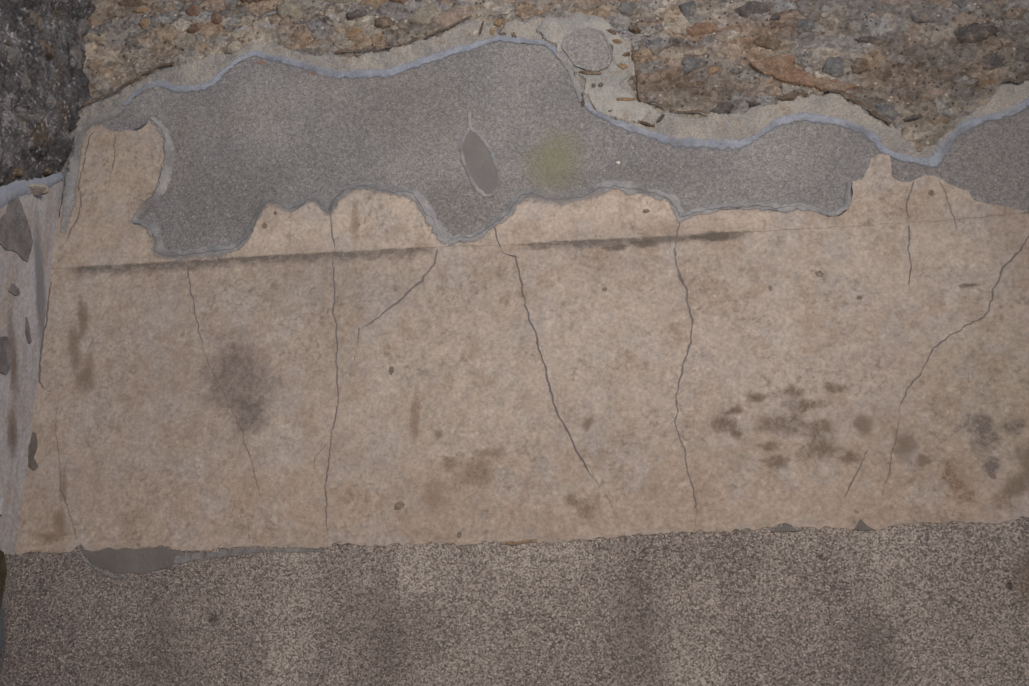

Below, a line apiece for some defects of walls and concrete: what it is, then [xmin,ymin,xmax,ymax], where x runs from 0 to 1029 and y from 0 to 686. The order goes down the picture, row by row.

spalling [0,0,1029,262]
crack [325,213,438,527]
crack [494,226,597,482]
crack [674,223,697,508]
crack [901,238,1028,402]